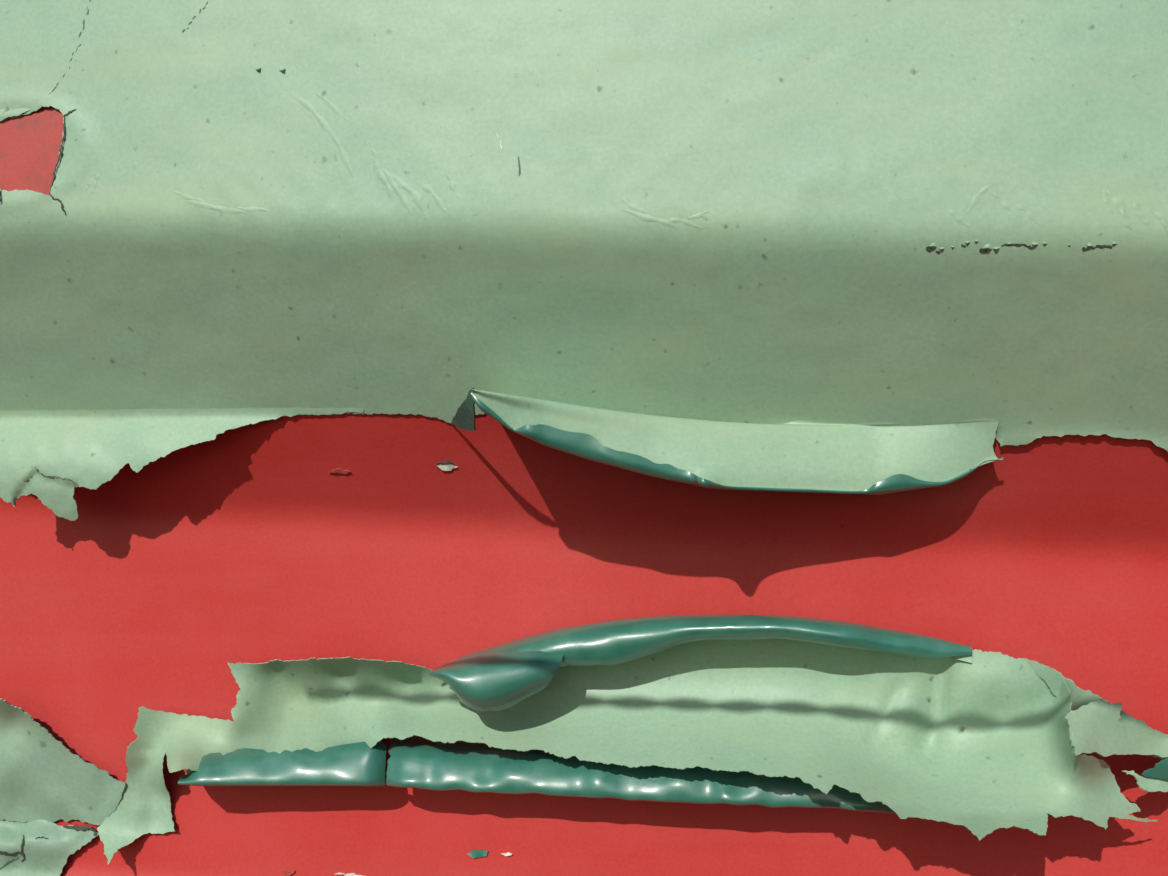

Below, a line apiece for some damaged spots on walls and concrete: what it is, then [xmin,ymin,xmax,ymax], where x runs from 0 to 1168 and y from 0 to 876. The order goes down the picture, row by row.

spalling [0,106,66,202]
peeling [0,407,364,521]
peeling [435,461,457,471]
peeling [451,388,1003,495]
peeling [0,615,1168,876]